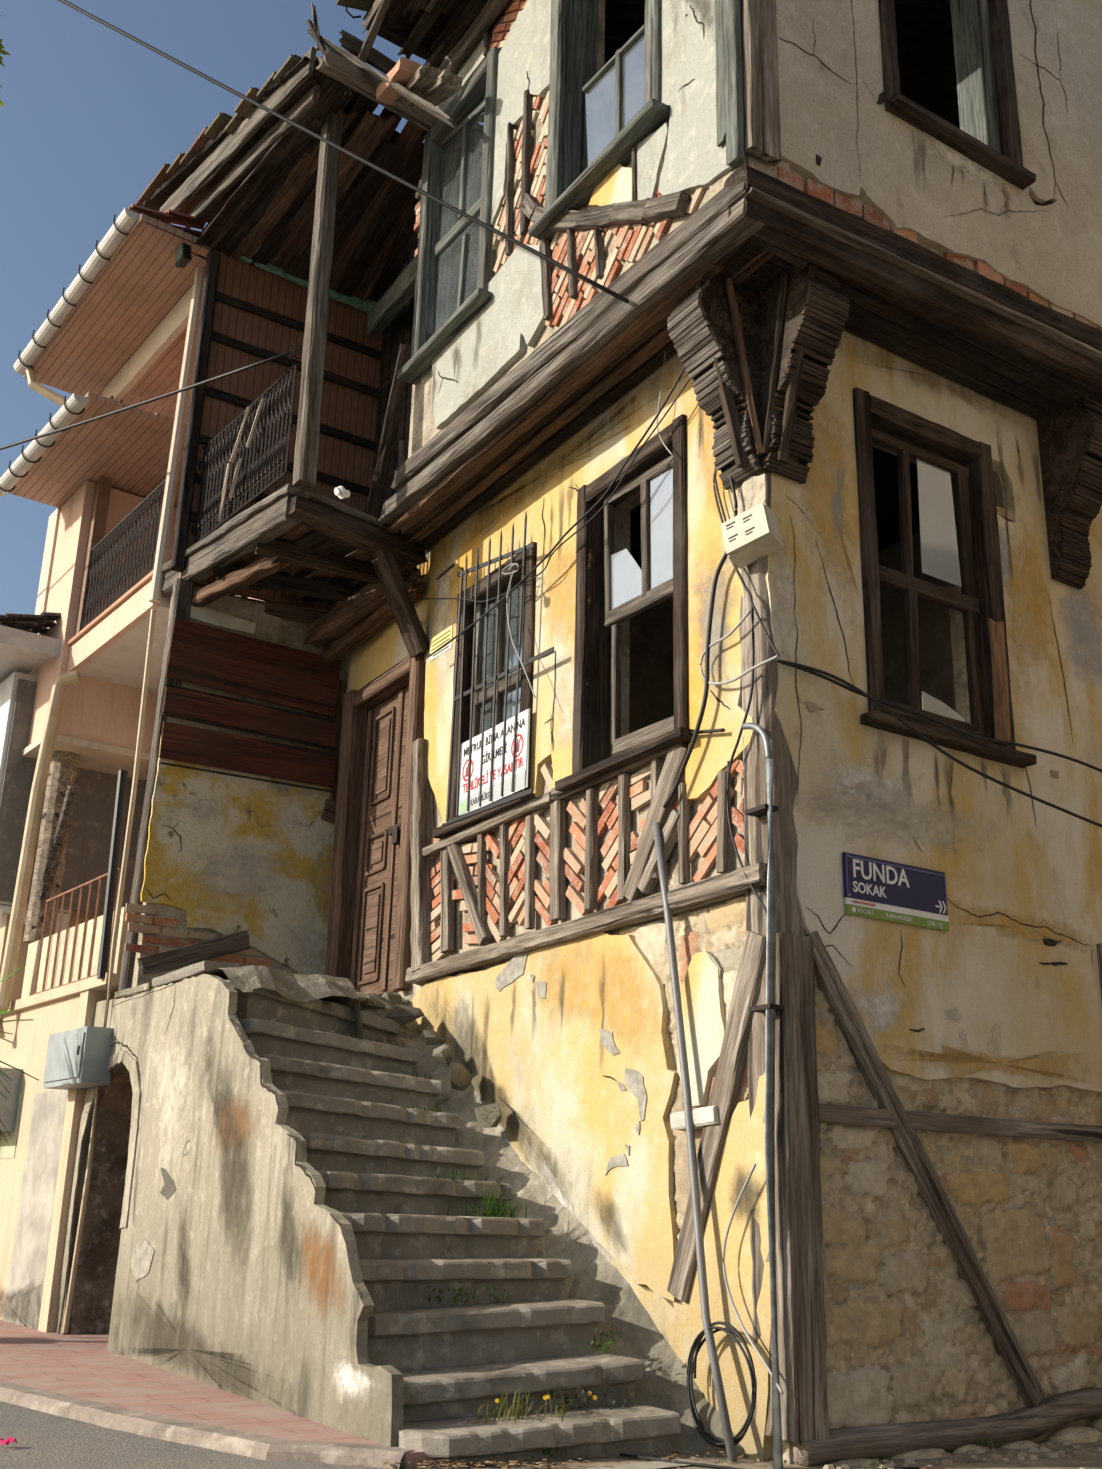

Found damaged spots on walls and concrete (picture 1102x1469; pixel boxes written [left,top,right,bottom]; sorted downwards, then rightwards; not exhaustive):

spalling [490,0,527,49]
crack [948,0,1068,216]
spalling [492,90,706,328]
spalling [778,154,917,243]
spalling [943,251,1102,331]
spalling [125,903,216,955]
peeling [920,1009,1069,1078]
leakage [152,1036,191,1171]
leakage [214,1083,249,1241]
leakage [281,1198,333,1306]
leakage [138,1307,249,1389]
leakage [335,1364,369,1395]